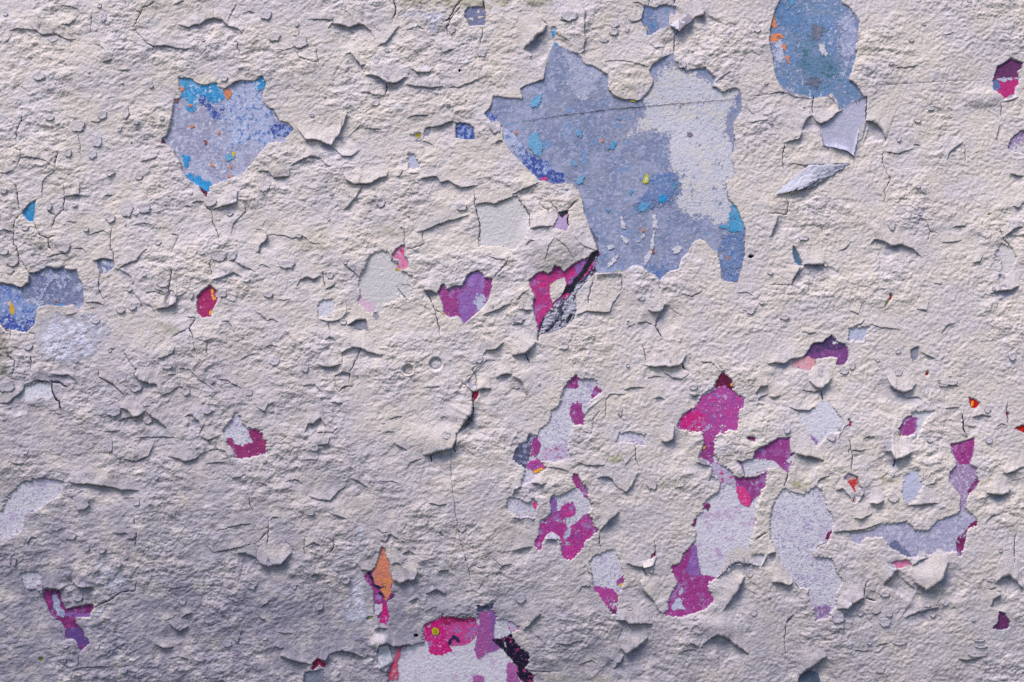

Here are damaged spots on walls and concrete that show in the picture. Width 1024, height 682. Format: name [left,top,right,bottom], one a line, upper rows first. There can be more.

crack [443,0,485,45]
crack [512,99,731,123]
peeling [764,0,921,196]
peeling [992,59,1022,102]
crack [11,116,81,272]
peeling [0,0,773,519]
crack [396,283,442,336]
crack [0,323,67,412]
peeling [358,293,1024,682]
peeling [21,570,127,673]